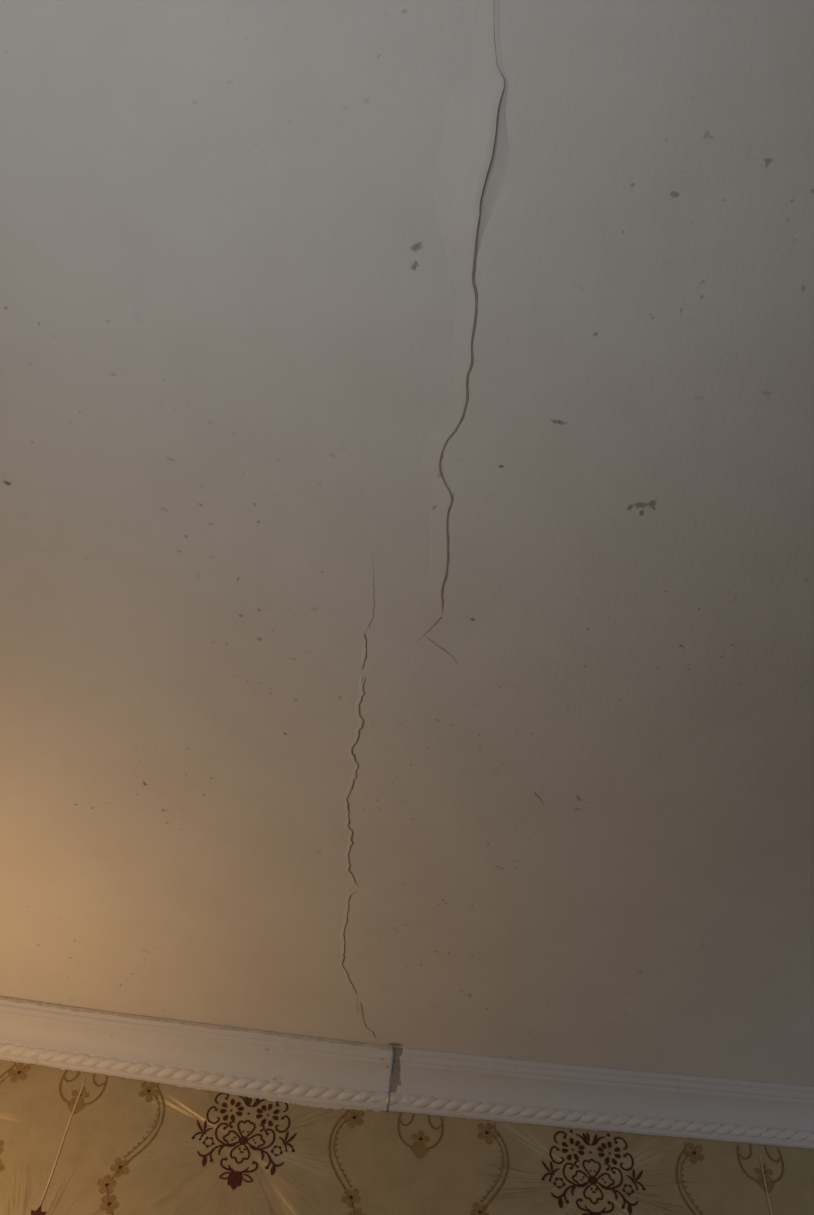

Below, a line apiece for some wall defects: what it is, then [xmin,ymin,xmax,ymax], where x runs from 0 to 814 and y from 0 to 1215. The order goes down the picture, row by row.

crack [471,0,509,132]
crack [414,217,481,670]
crack [339,554,403,1112]